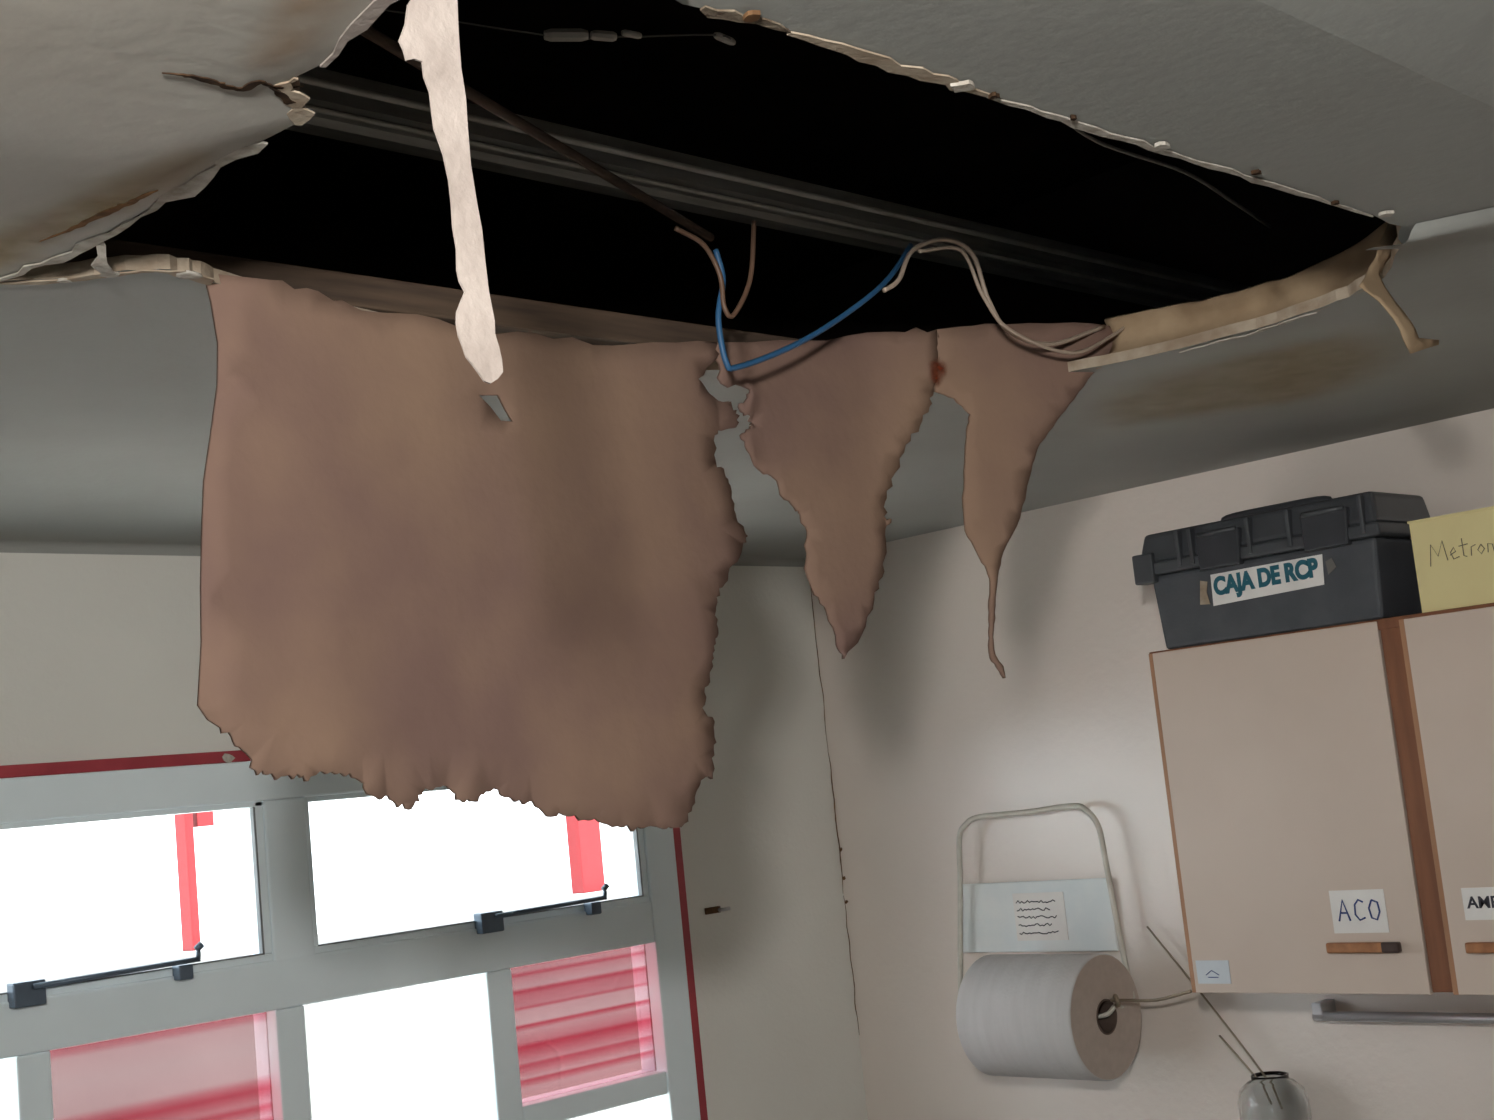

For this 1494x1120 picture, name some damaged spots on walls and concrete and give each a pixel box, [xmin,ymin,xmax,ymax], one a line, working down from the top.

crack [162,72,304,105]
spalling [275,77,315,126]
spalling [700,5,1394,218]
spalling [0,141,268,285]
peeling [320,0,503,384]